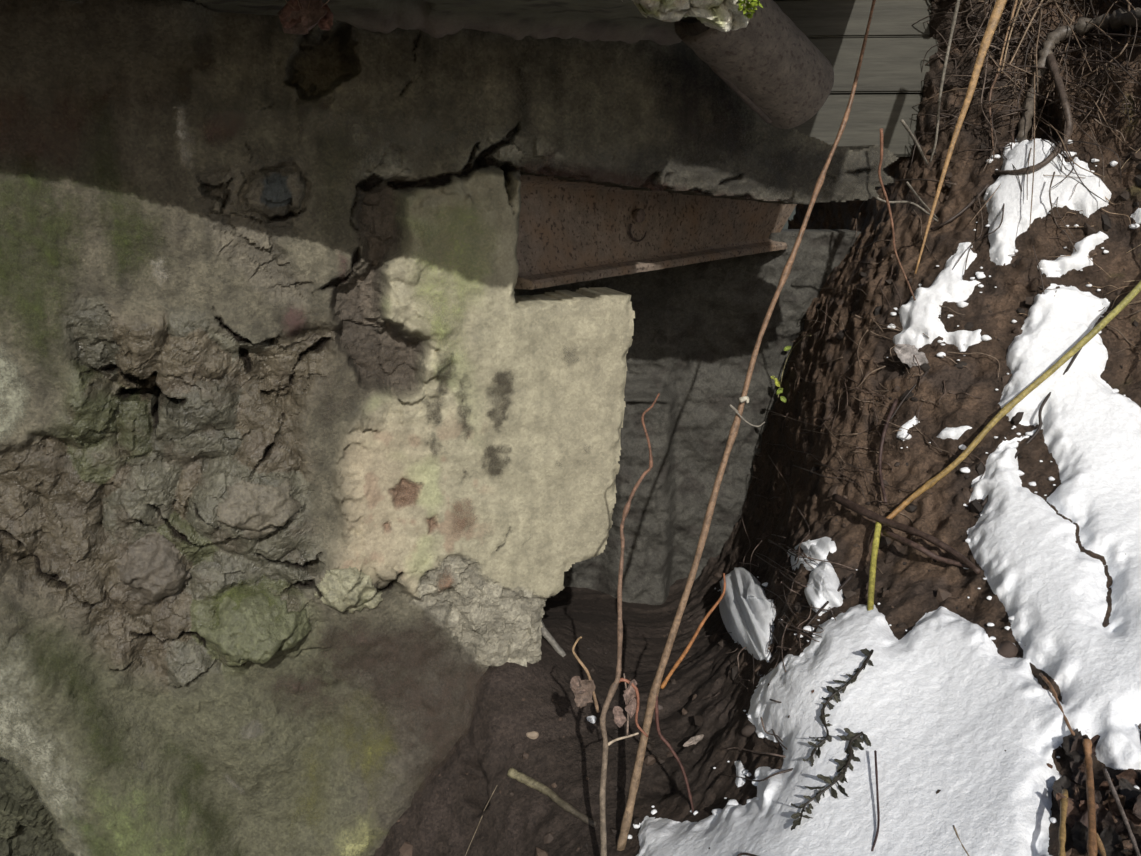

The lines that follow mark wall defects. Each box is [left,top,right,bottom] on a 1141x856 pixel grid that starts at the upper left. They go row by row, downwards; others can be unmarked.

crack [251,211,302,220]
crack [322,124,589,289]
crack [640,172,751,199]
spalling [0,142,426,692]
spalling [409,553,554,672]
efflorescence [0,670,76,821]